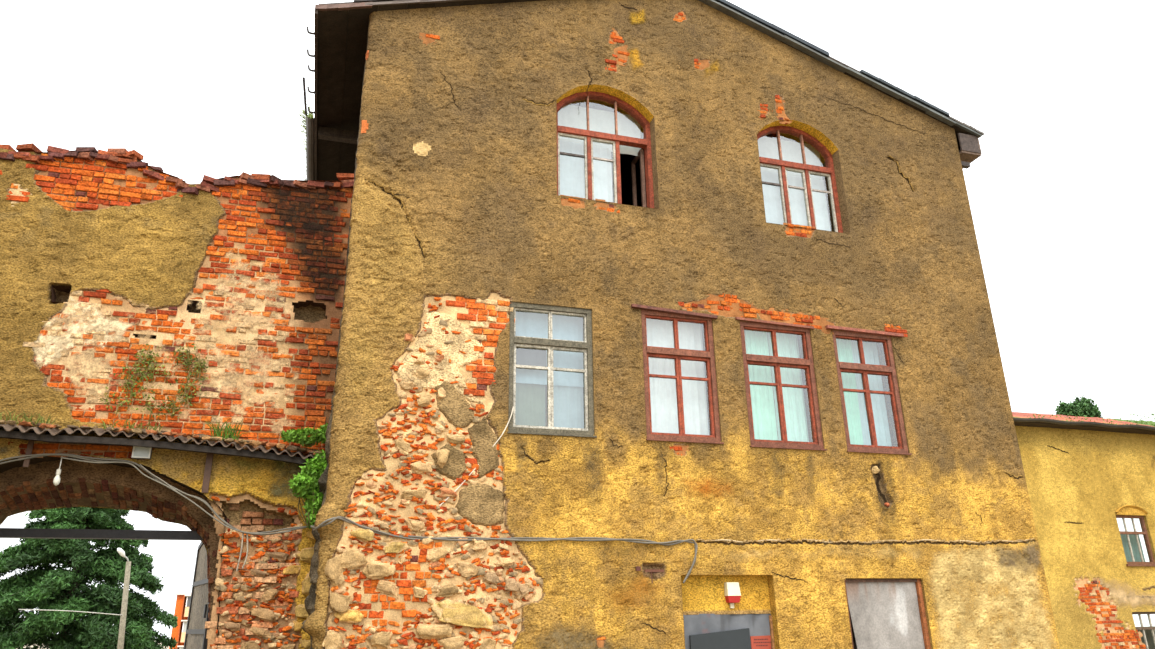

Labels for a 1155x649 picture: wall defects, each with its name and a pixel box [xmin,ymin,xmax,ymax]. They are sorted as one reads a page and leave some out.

spalling [605,28,630,72]
crack [365,179,425,258]
spalling [0,143,354,457]
spalling [678,293,834,334]
spalling [884,324,908,338]
spalling [8,442,156,460]
spalling [205,293,543,649]
peeling [933,546,1051,649]
spalling [1073,578,1155,649]